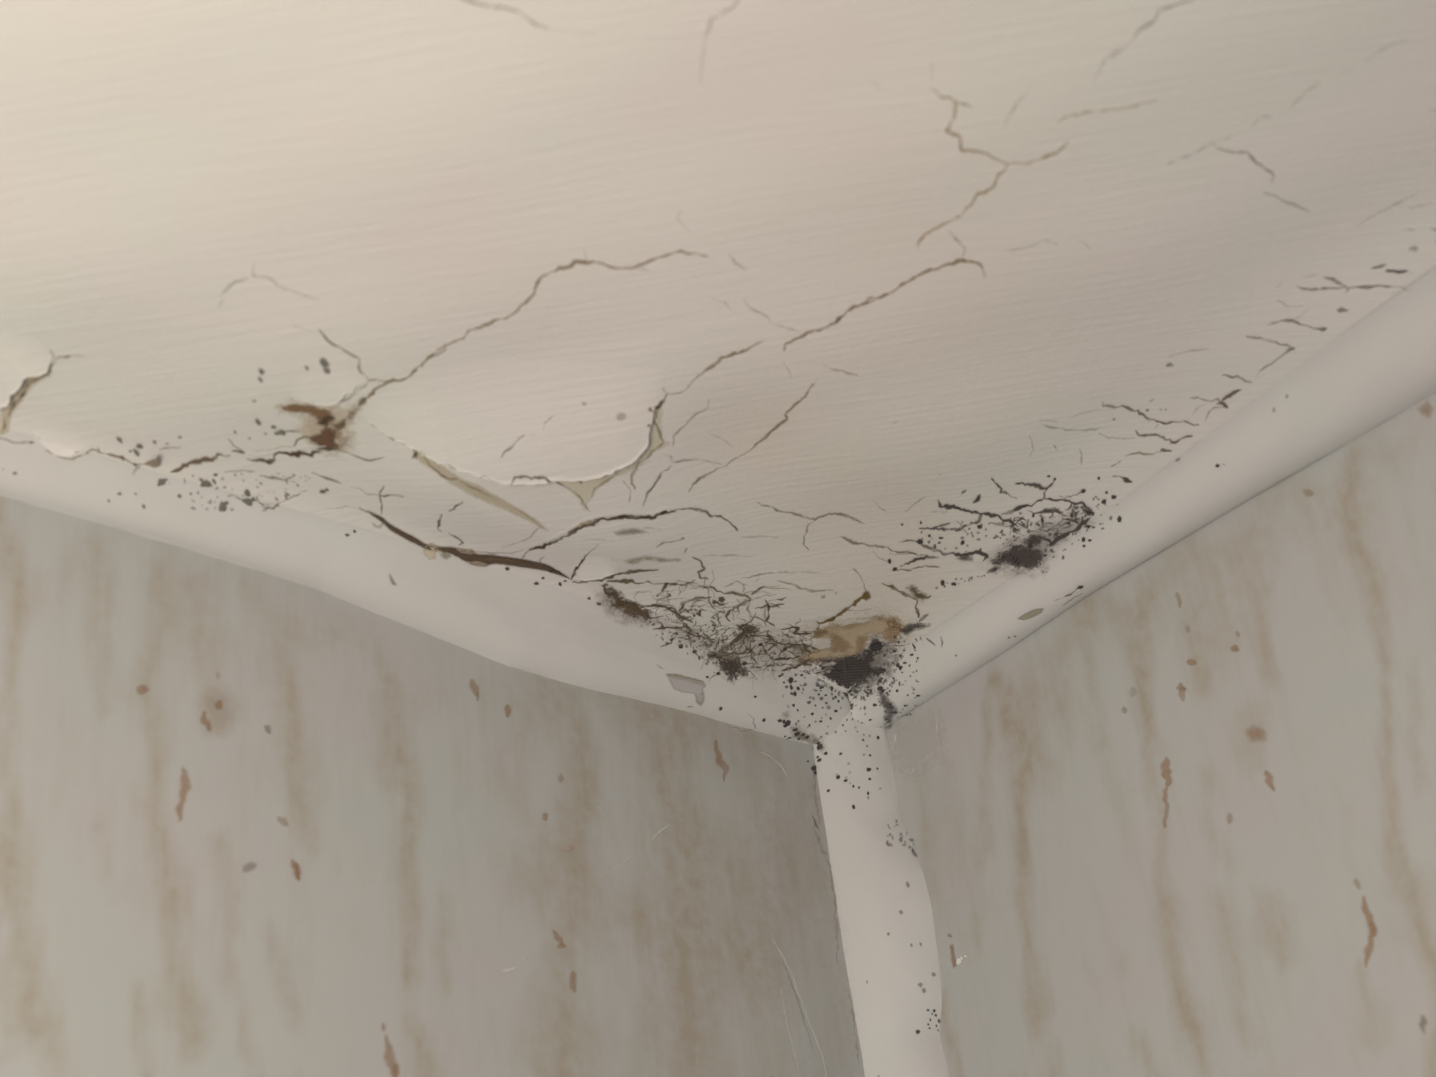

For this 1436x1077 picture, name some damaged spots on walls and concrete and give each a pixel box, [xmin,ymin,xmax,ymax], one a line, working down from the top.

crack [1220,149,1273,184]
peeling [0,331,92,457]
crack [29,250,708,514]
crack [501,96,1157,584]
crack [1102,264,1407,483]
crack [437,502,463,545]
peeling [412,450,543,527]
damp [888,475,1122,587]
damp [588,580,943,809]